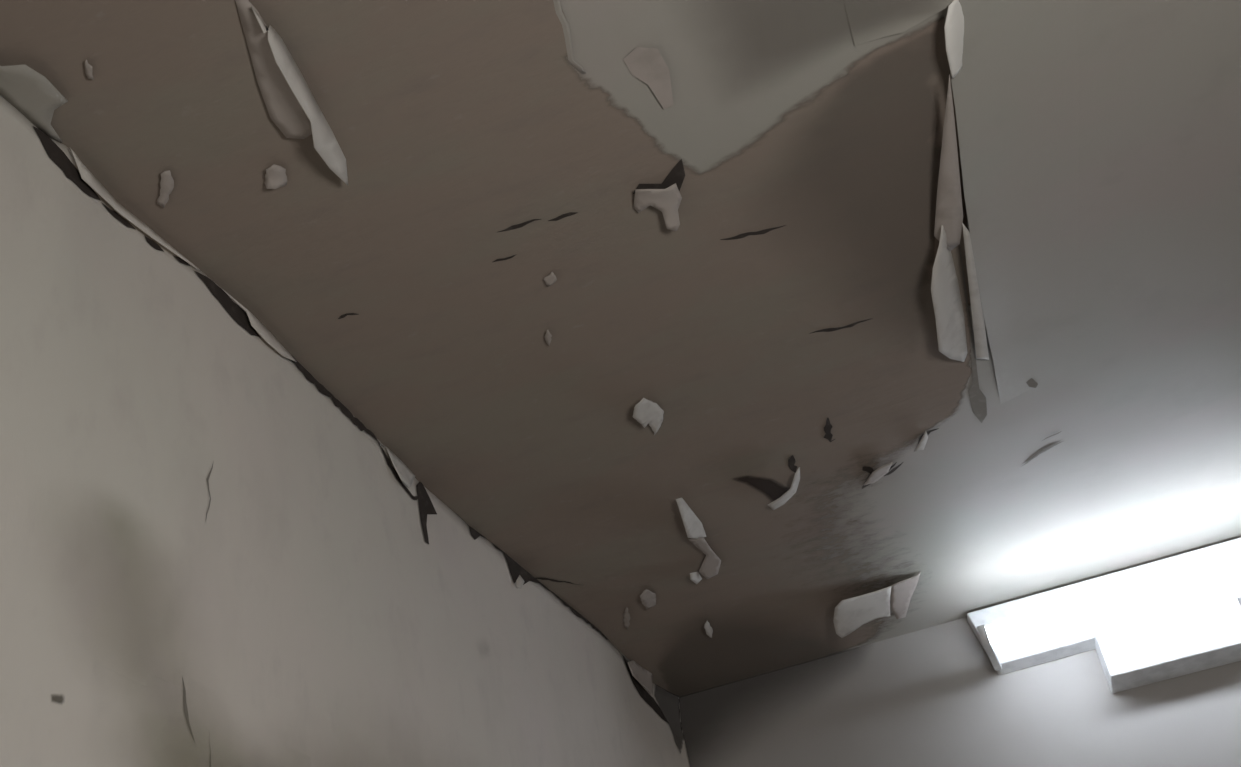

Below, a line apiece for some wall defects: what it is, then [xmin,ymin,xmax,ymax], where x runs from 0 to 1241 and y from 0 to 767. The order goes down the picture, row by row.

peeling [0,0,972,724]